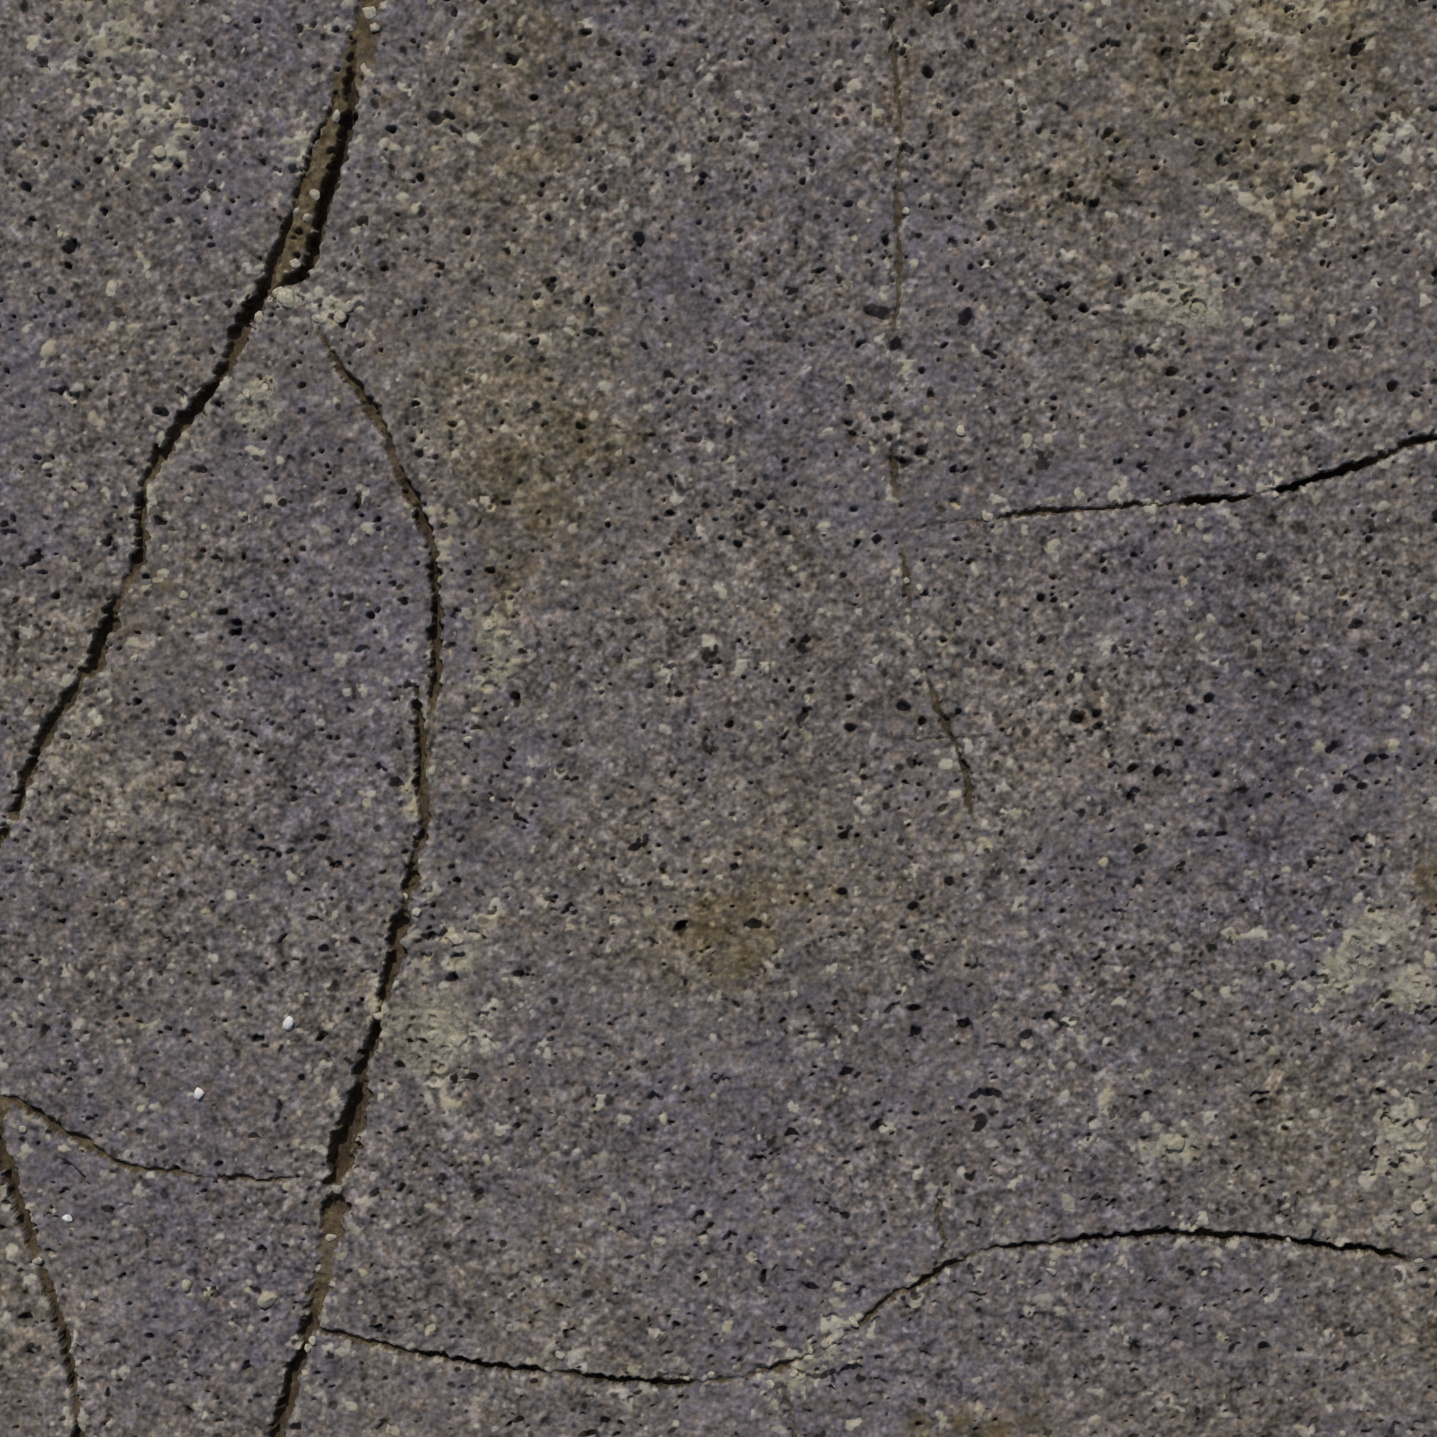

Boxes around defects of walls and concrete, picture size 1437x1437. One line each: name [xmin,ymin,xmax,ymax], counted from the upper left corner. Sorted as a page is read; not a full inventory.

crack [0,0,388,850]
crack [0,301,1437,1437]
crack [879,0,1437,926]